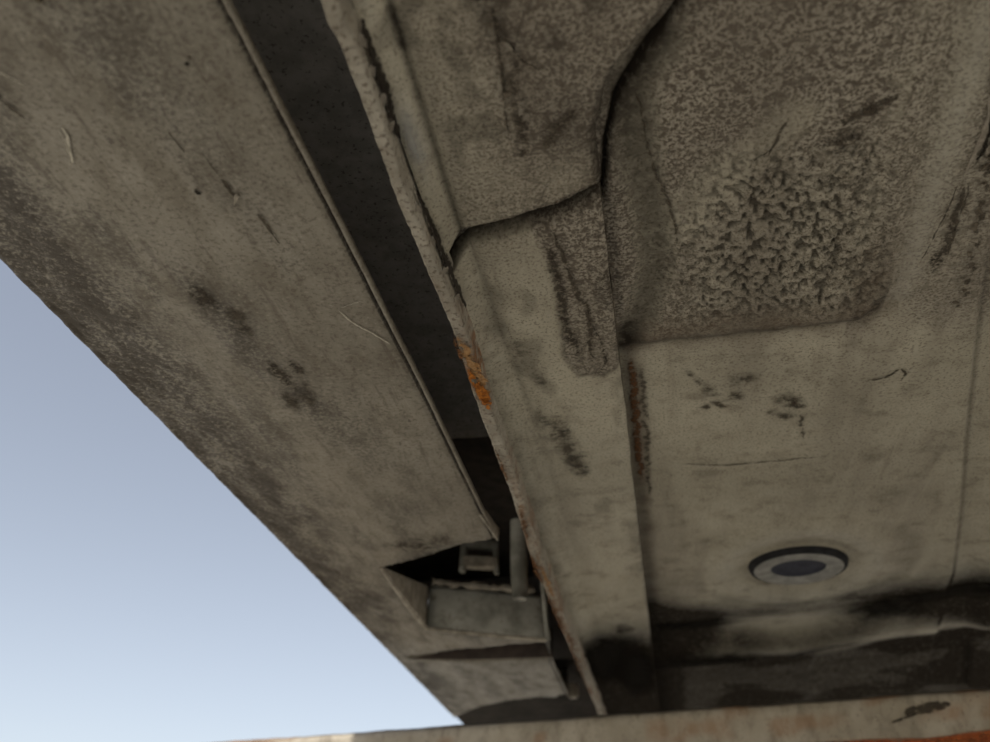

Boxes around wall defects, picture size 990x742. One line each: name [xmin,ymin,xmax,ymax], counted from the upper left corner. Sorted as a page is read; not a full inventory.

crack [922,95,990,307]
leakage [267,361,315,409]
corrosion [453,337,492,410]
leakage [768,396,805,438]
corrosion [844,730,990,742]
leakage [892,701,950,723]